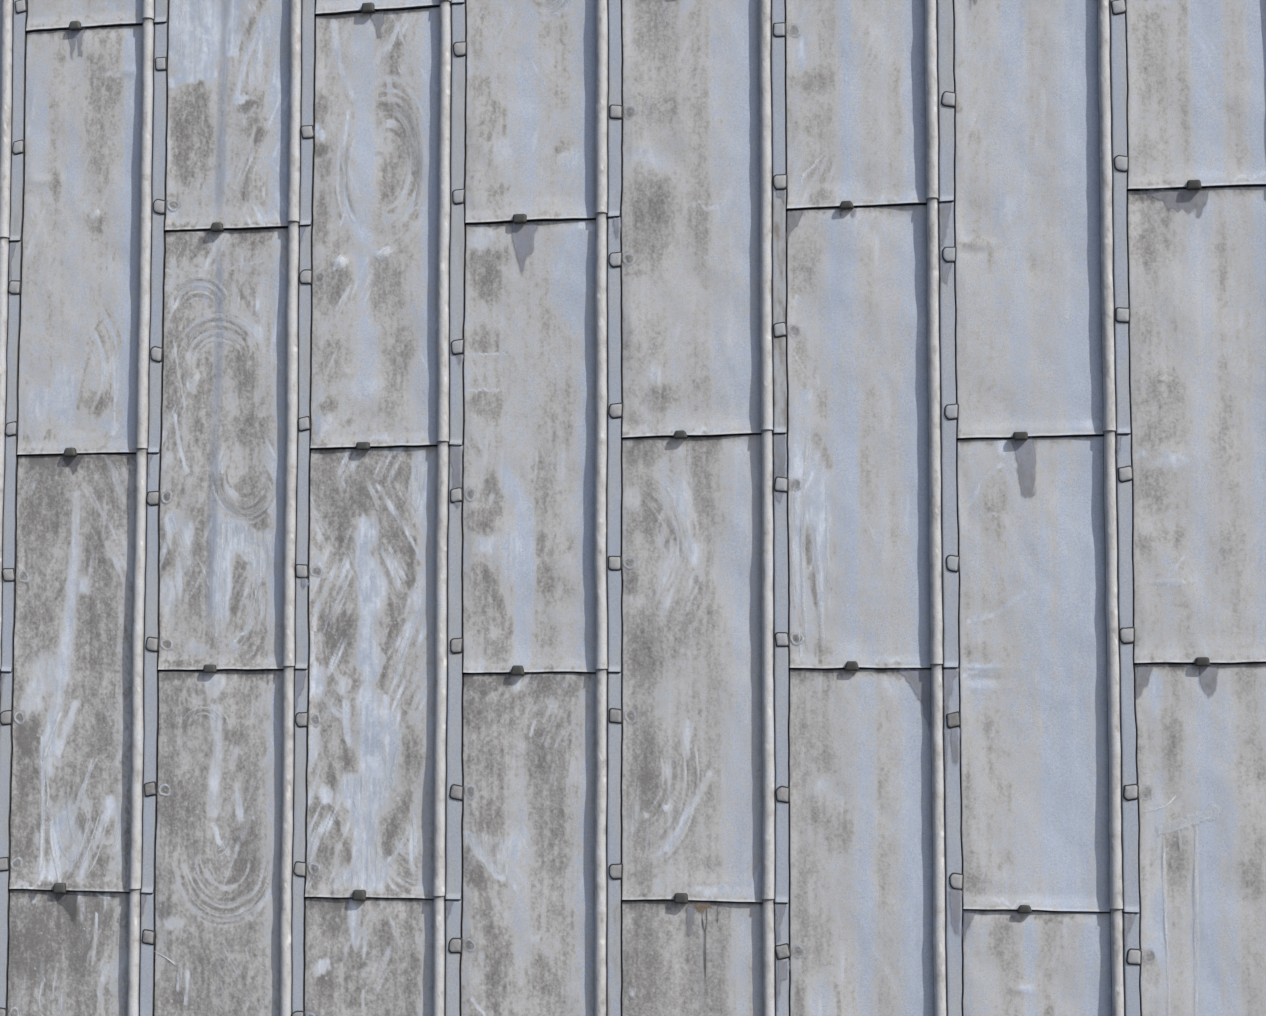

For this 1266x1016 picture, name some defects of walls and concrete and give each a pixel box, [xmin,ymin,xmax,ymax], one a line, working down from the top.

water stain [1142,189,1209,217]
water stain [512,223,538,272]
water stain [1012,438,1036,497]
water stain [899,669,958,726]